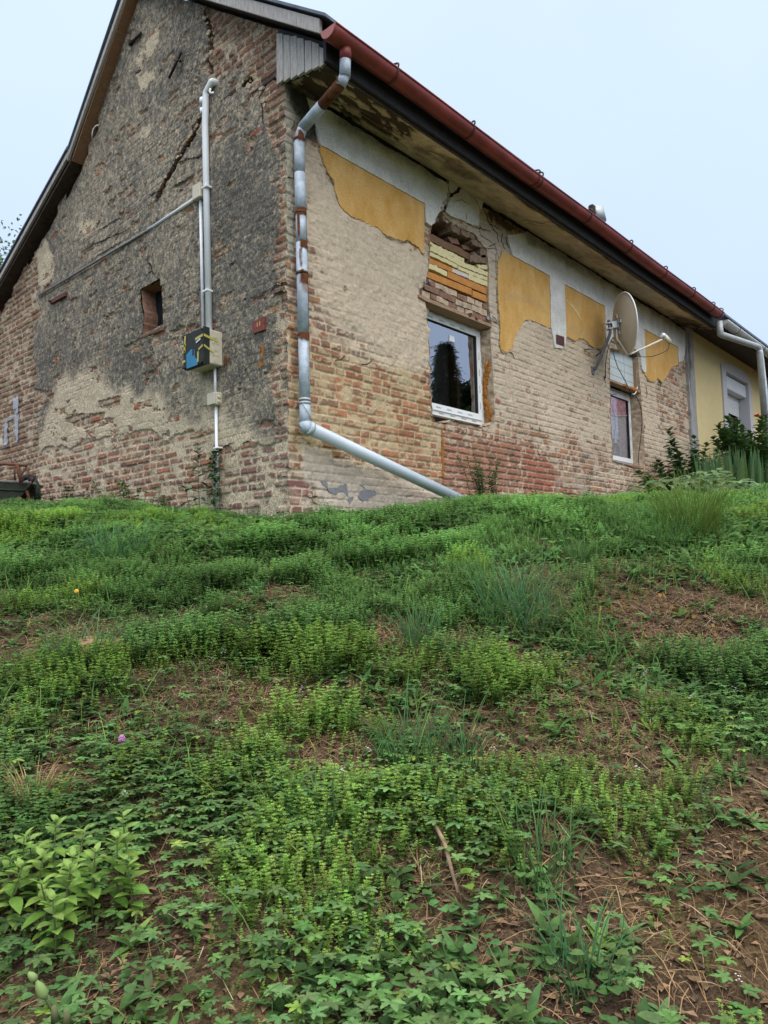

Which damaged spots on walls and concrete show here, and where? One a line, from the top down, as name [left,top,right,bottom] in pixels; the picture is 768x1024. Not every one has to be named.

crack [148,106,202,203]
peeling [318,144,551,354]
peeling [565,285,605,351]
peeling [644,330,678,383]
spalling [64,395,122,431]
peeling [307,480,377,504]